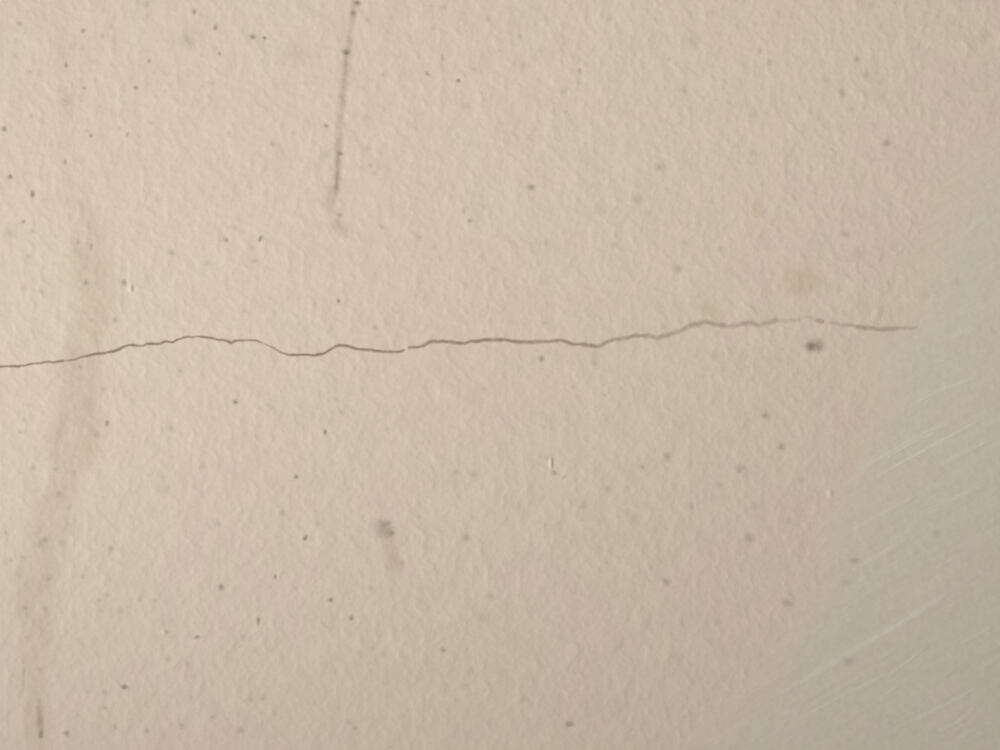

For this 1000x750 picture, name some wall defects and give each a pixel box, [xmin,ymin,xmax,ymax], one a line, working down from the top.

crack [0,336,258,367]